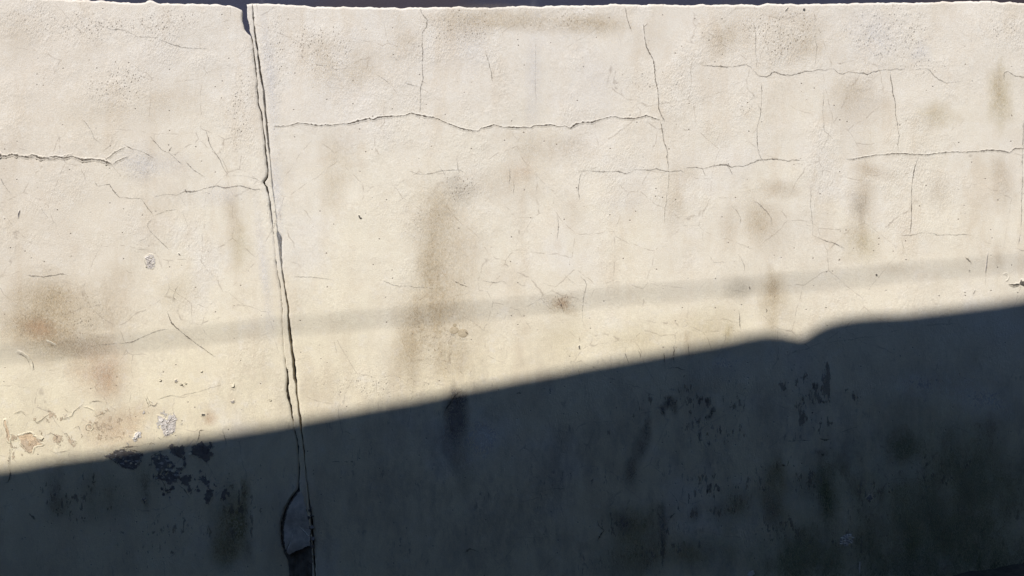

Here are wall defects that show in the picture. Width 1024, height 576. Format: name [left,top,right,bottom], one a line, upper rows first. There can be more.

crack [0,146,130,190]
crack [846,146,1024,176]
crack [252,14,670,576]
peeling [2,392,231,504]
flaking render [281,490,315,576]